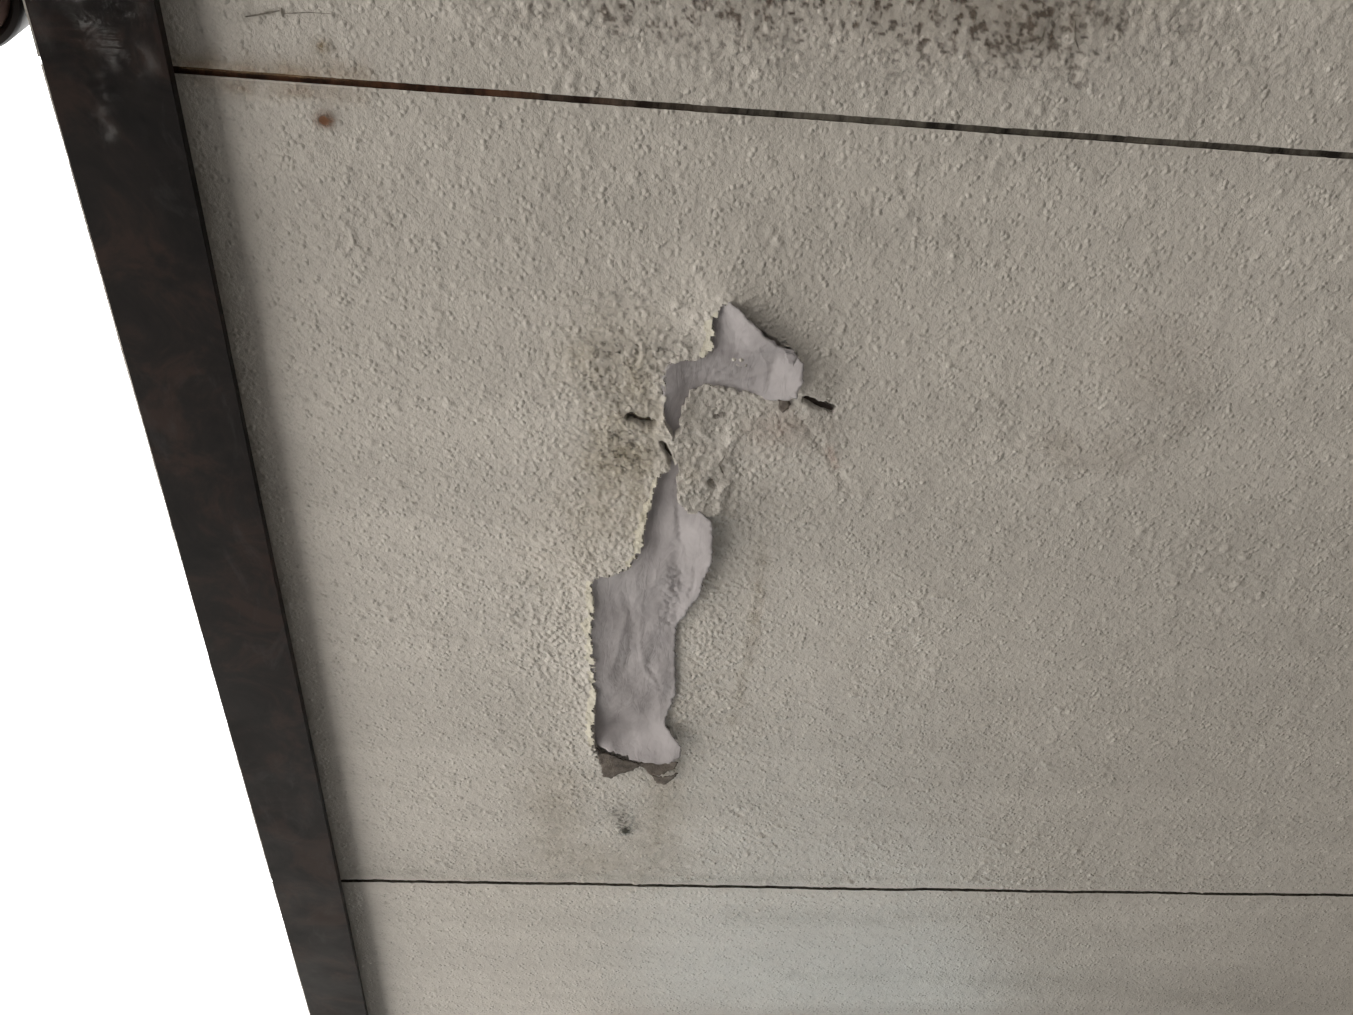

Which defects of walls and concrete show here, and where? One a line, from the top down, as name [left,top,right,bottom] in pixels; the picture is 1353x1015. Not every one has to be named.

water stain [852,0,1085,52]
peeling [661,302,804,433]
peeling [580,460,713,785]